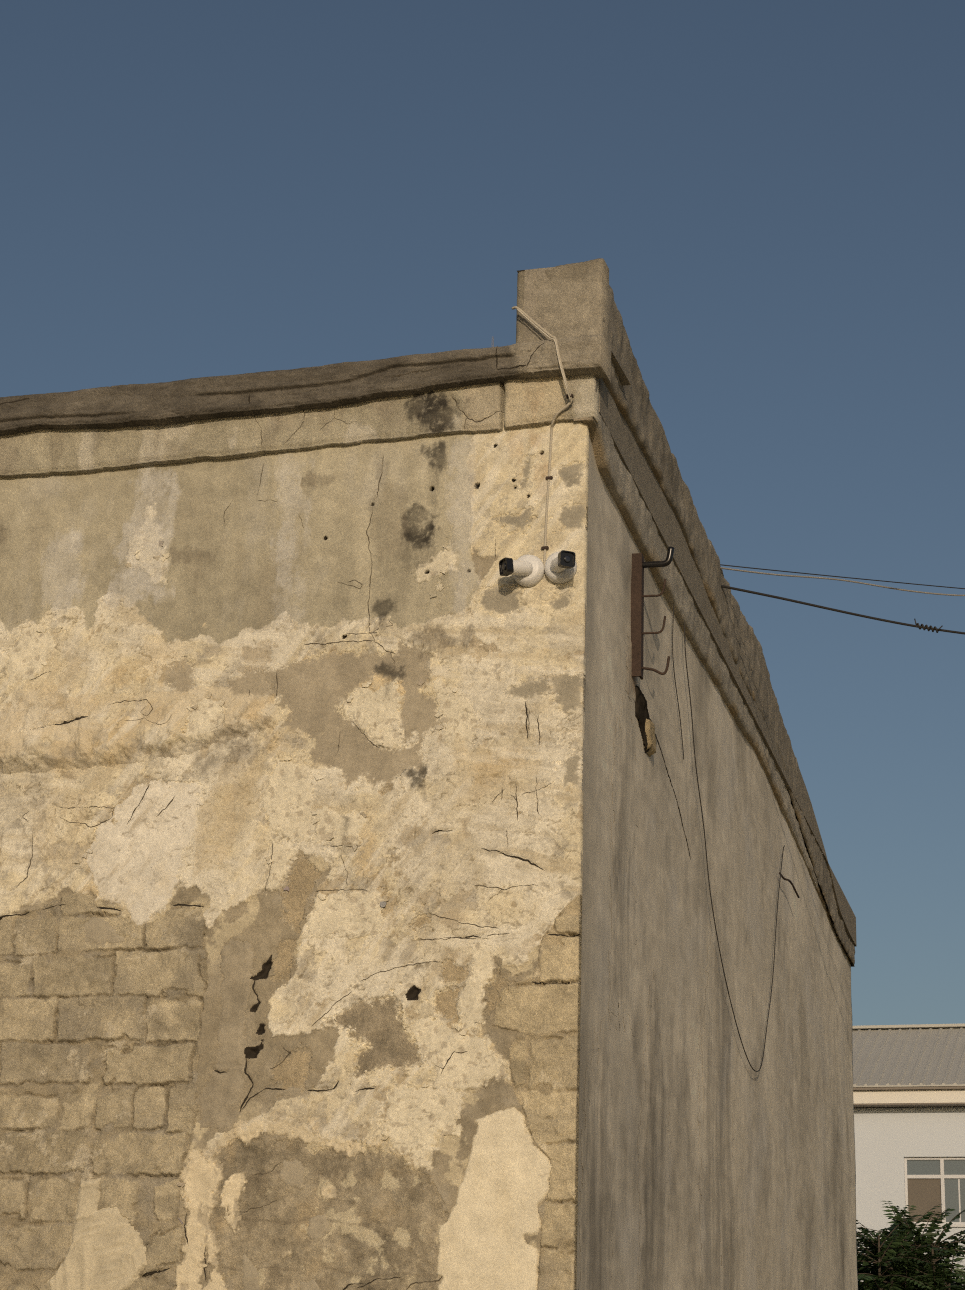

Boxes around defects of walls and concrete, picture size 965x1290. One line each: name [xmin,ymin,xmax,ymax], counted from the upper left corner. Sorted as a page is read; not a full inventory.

crack [305,456,395,664]
damp [362,388,486,701]
flaking render [156,636,482,990]
flaking render [503,669,586,715]
flaking render [552,749,583,794]
flaking render [0,776,582,1290]
crack [214,1050,375,1111]
crack [312,845,543,1026]